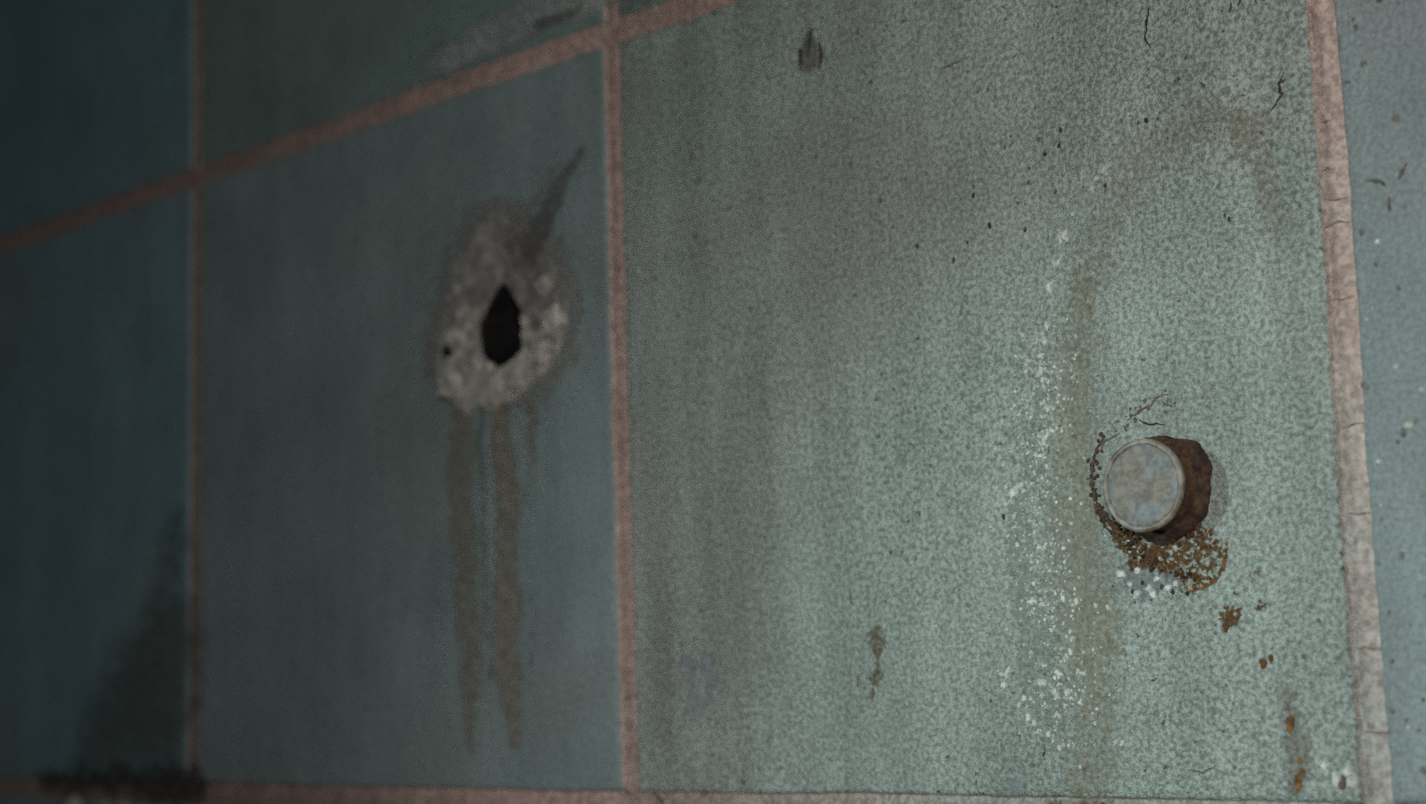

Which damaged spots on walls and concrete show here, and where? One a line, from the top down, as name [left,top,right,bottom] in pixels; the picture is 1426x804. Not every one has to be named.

crack [1143,6,1151,48]
crack [1271,72,1285,111]
hole [423,162,583,416]
damp [488,402,522,746]
corrosion [1110,514,1228,592]
corrosion [1211,604,1266,632]
corrosion [857,625,886,699]